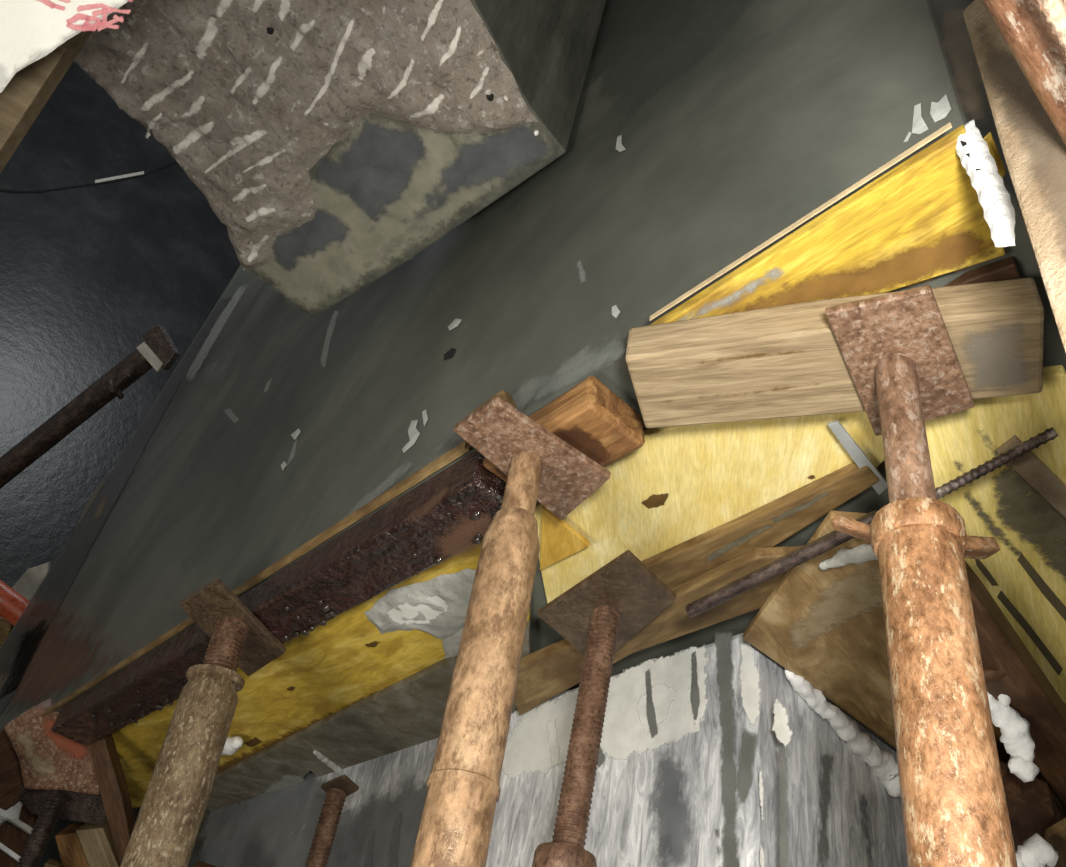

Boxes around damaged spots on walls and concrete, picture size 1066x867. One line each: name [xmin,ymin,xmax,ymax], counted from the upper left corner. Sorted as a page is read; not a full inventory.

spalling [73,0,539,271]
leakage [715,633,764,867]
leakage [201,772,327,867]
leakage [326,783,427,867]
leakage [653,757,688,867]
leakage [779,746,789,867]
leakage [818,755,833,867]
leakage [860,796,871,857]